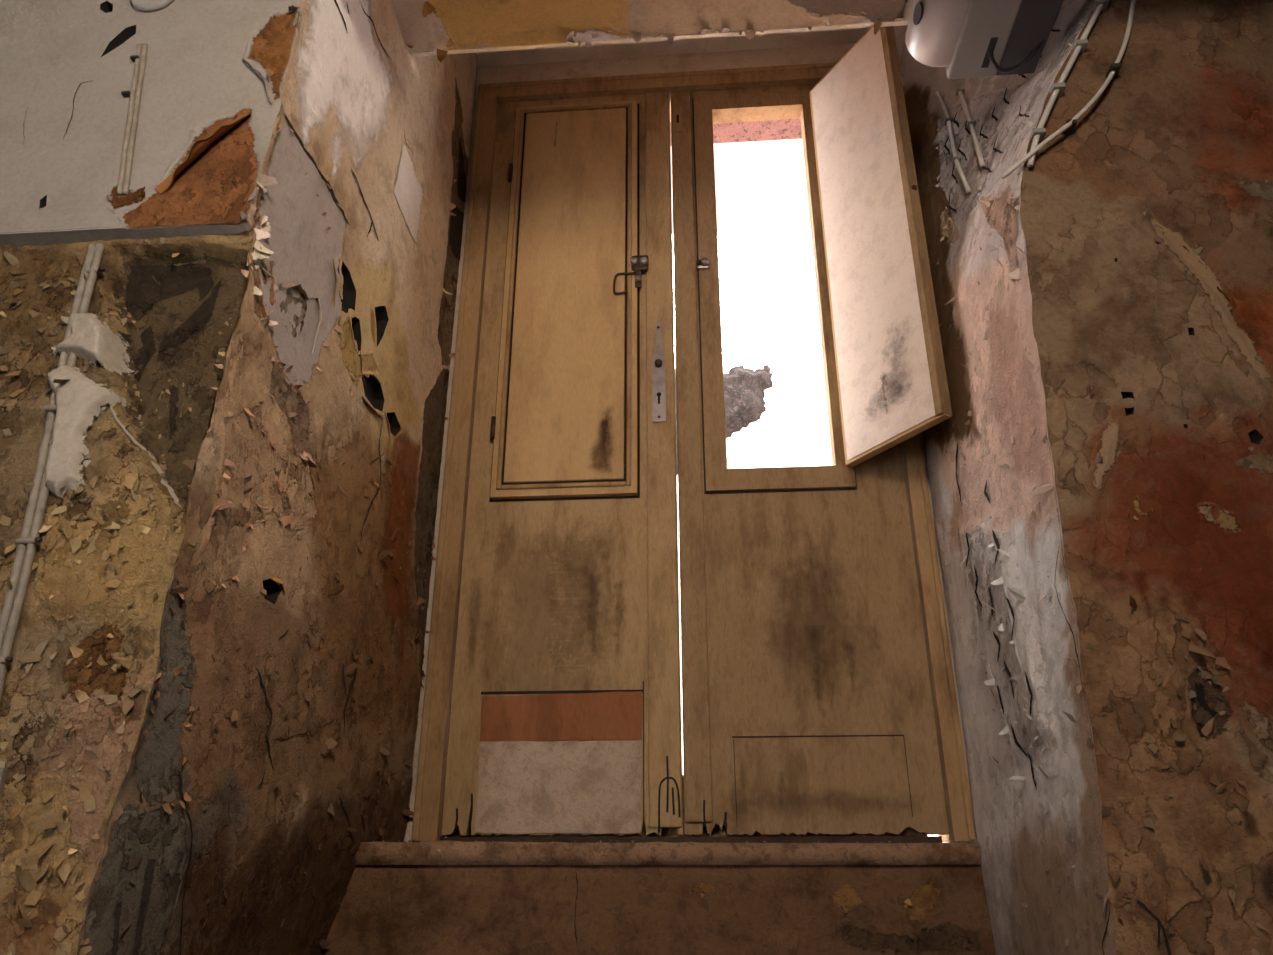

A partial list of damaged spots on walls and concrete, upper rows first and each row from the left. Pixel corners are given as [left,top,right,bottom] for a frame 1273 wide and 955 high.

peeling [242,5,301,106]
peeling [566,25,764,48]
flaking render [787,0,908,35]
water stain [878,377,903,403]
flaking render [0,102,380,955]
peeling [963,523,1049,790]
flaking render [1181,659,1273,761]